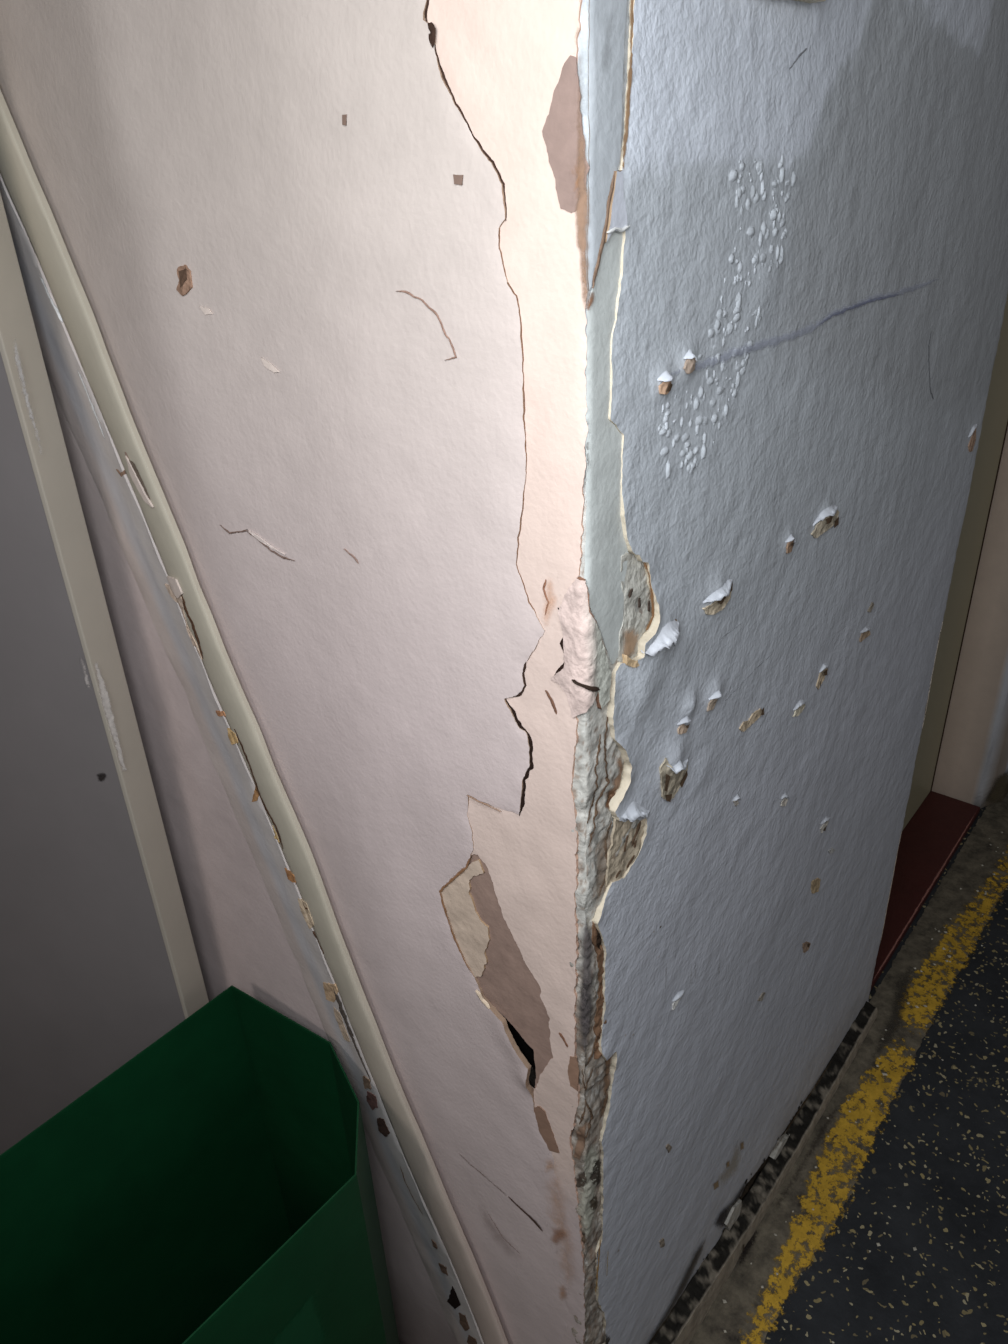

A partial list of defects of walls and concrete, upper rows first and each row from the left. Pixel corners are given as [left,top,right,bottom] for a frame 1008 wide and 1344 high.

peeling [176,265,193,296]
crack [399,290,457,360]
peeling [657,349,697,395]
crack [425,0,564,816]
crack [220,525,294,561]
peeling [811,505,839,538]
peeling [702,579,733,615]
flaking render [439,0,680,1344]
peeling [677,716,692,734]
peeling [649,758,688,802]
crack [466,1160,542,1254]
peeling [431,1239,477,1344]